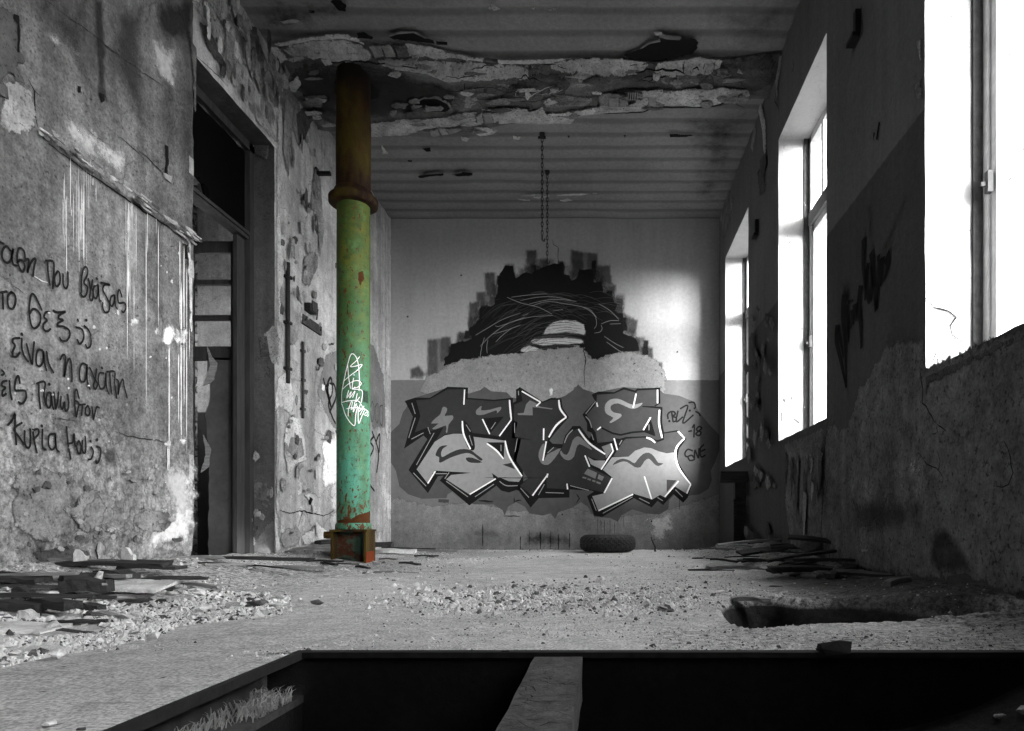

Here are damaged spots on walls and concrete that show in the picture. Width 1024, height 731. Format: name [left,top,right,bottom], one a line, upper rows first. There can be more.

peeling [0,7,38,135]
water stain [64,168,94,270]
water stain [147,213,159,320]
peeling [164,239,192,332]
spalling [191,0,767,553]
peeling [727,305,1024,597]
crack [918,298,964,479]
rust [338,511,370,523]